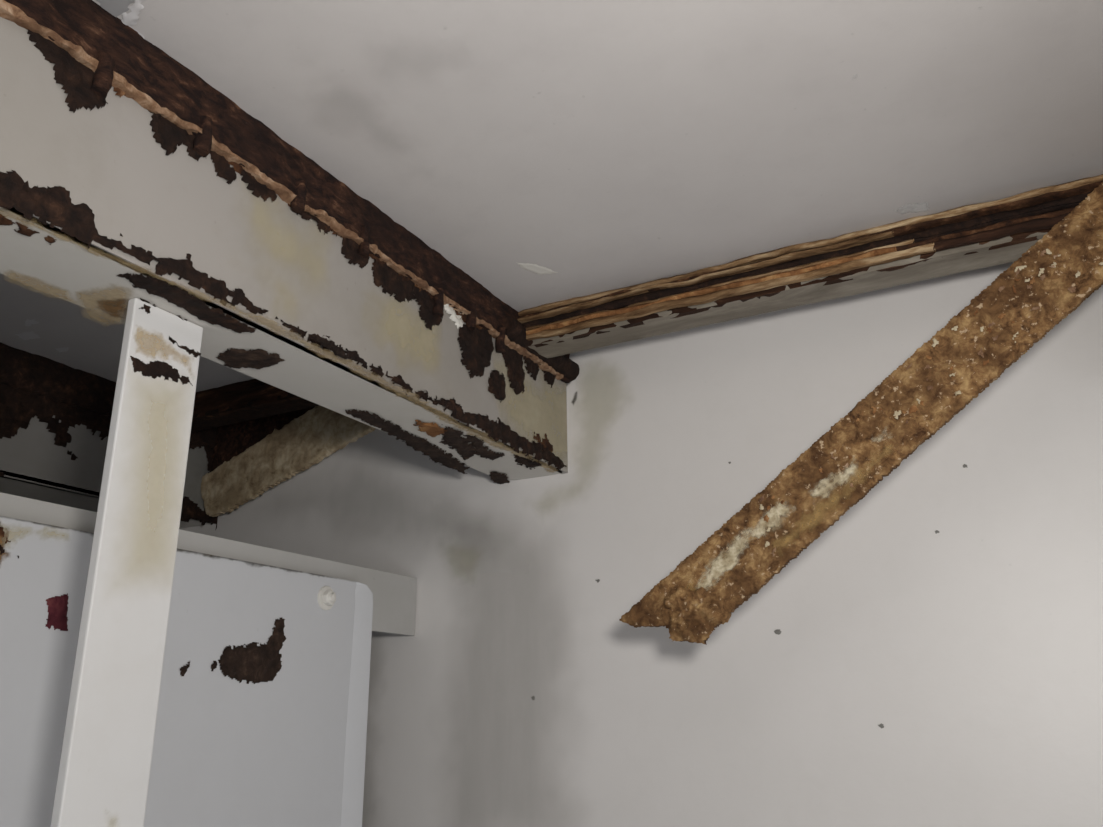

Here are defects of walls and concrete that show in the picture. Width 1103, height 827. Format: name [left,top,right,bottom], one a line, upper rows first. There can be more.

peeling [97,0,154,45]
rust [0,170,567,484]
rust [871,338,939,423]
peeling [183,446,209,511]
rust [0,527,19,562]
rust [180,496,218,529]
rust [177,548,324,576]
rust [759,494,784,557]